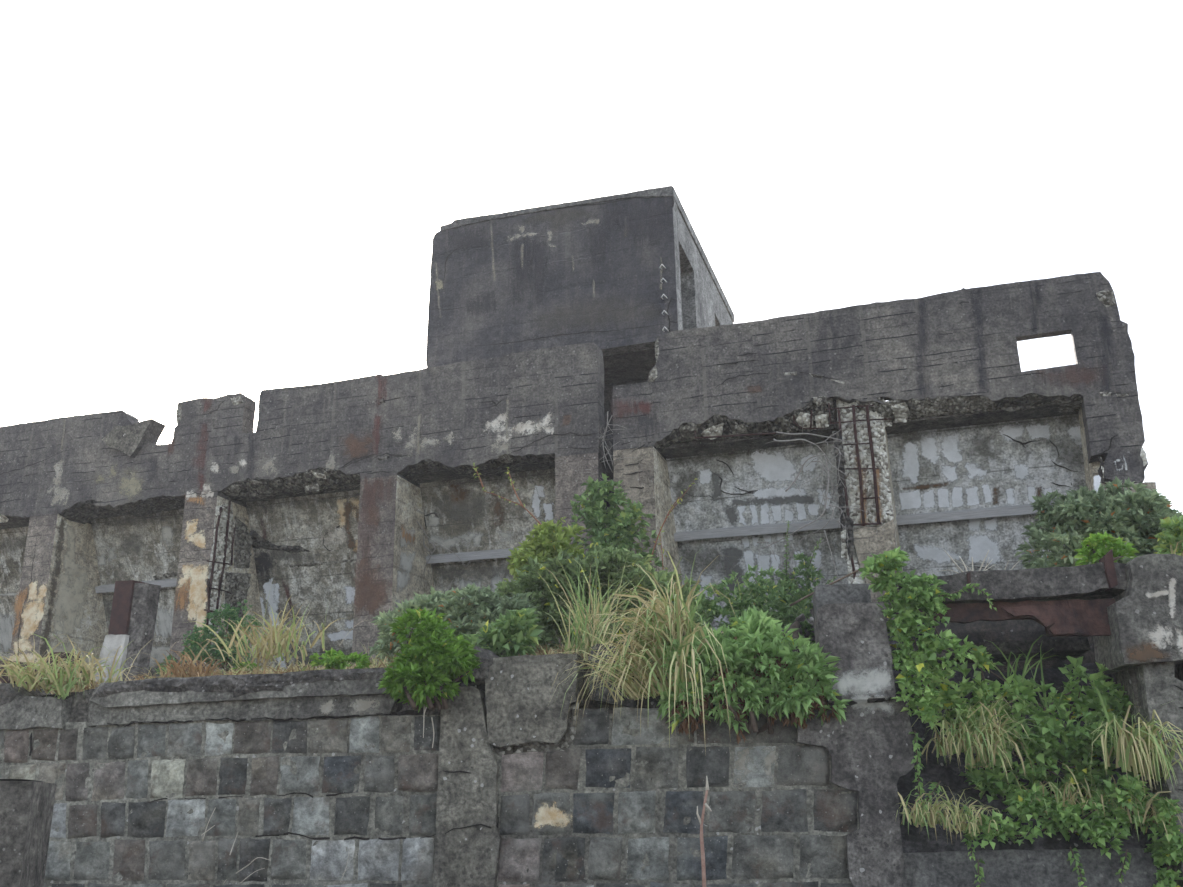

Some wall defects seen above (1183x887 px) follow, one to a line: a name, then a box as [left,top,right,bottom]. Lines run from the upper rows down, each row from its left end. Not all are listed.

corrosion [185,398,211,504]
peeling [700,468,712,484]
peeling [701,423,748,440]
water stain [712,474,814,525]
spalling [737,396,1052,595]
peeling [994,397,1082,448]
crack [1003,434,1140,487]
peeling [8,525,89,663]
spalling [153,501,357,639]
water stain [683,547,743,592]
peeling [699,574,730,627]
water stain [0,615,14,652]